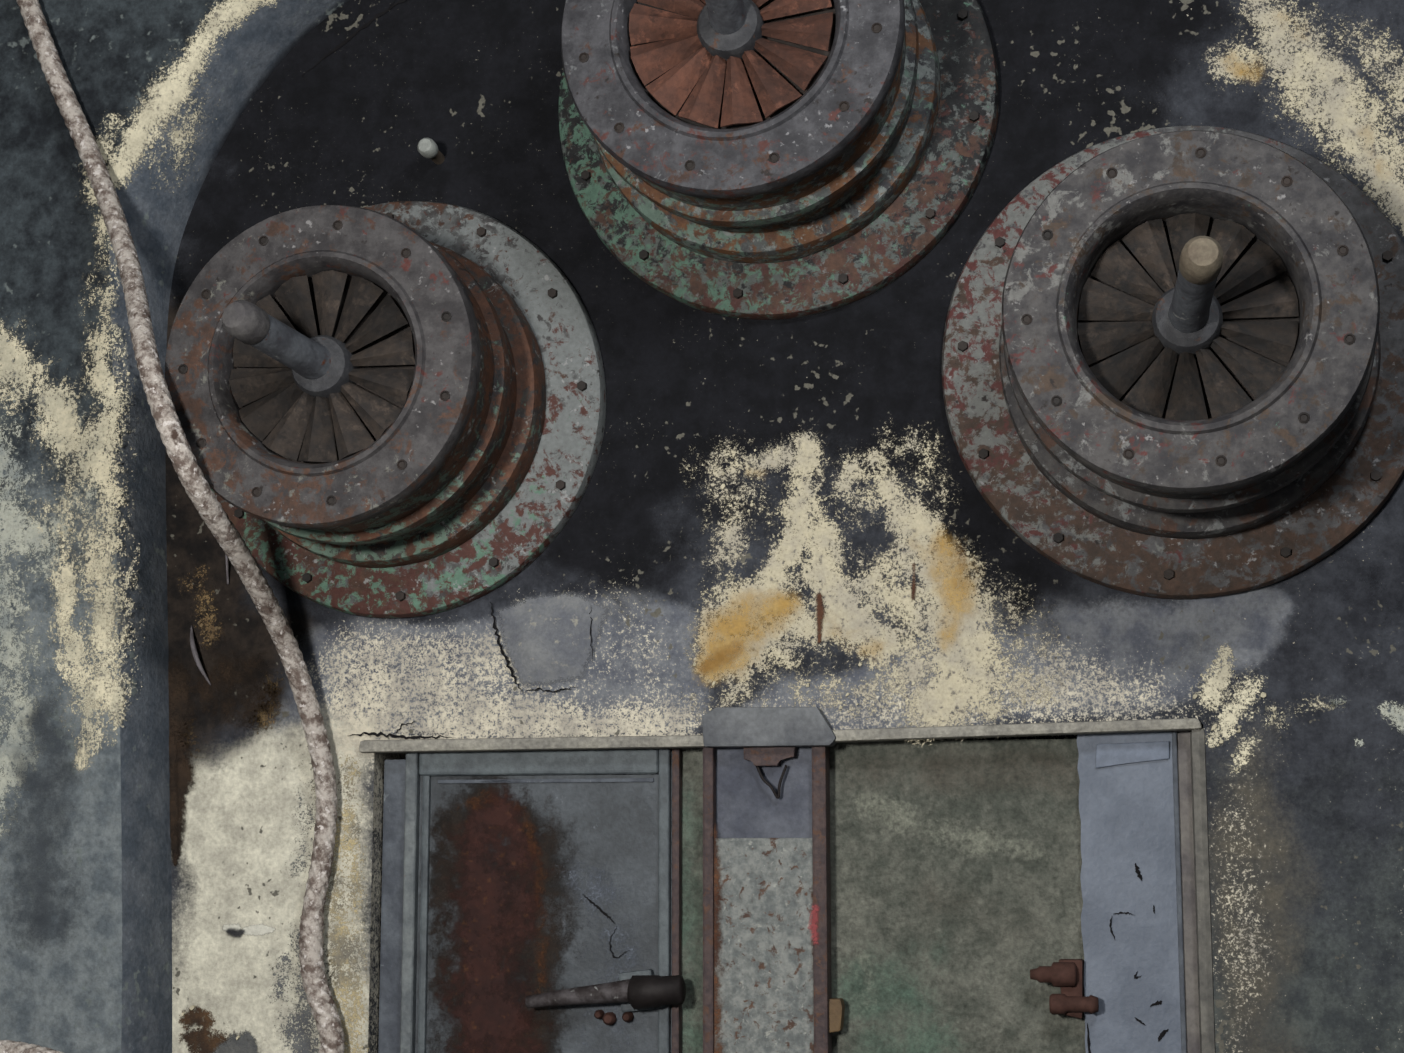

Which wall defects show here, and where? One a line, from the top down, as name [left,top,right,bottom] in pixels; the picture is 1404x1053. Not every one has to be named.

water stain [168,657,280,866]
rust [428,776,576,1053]